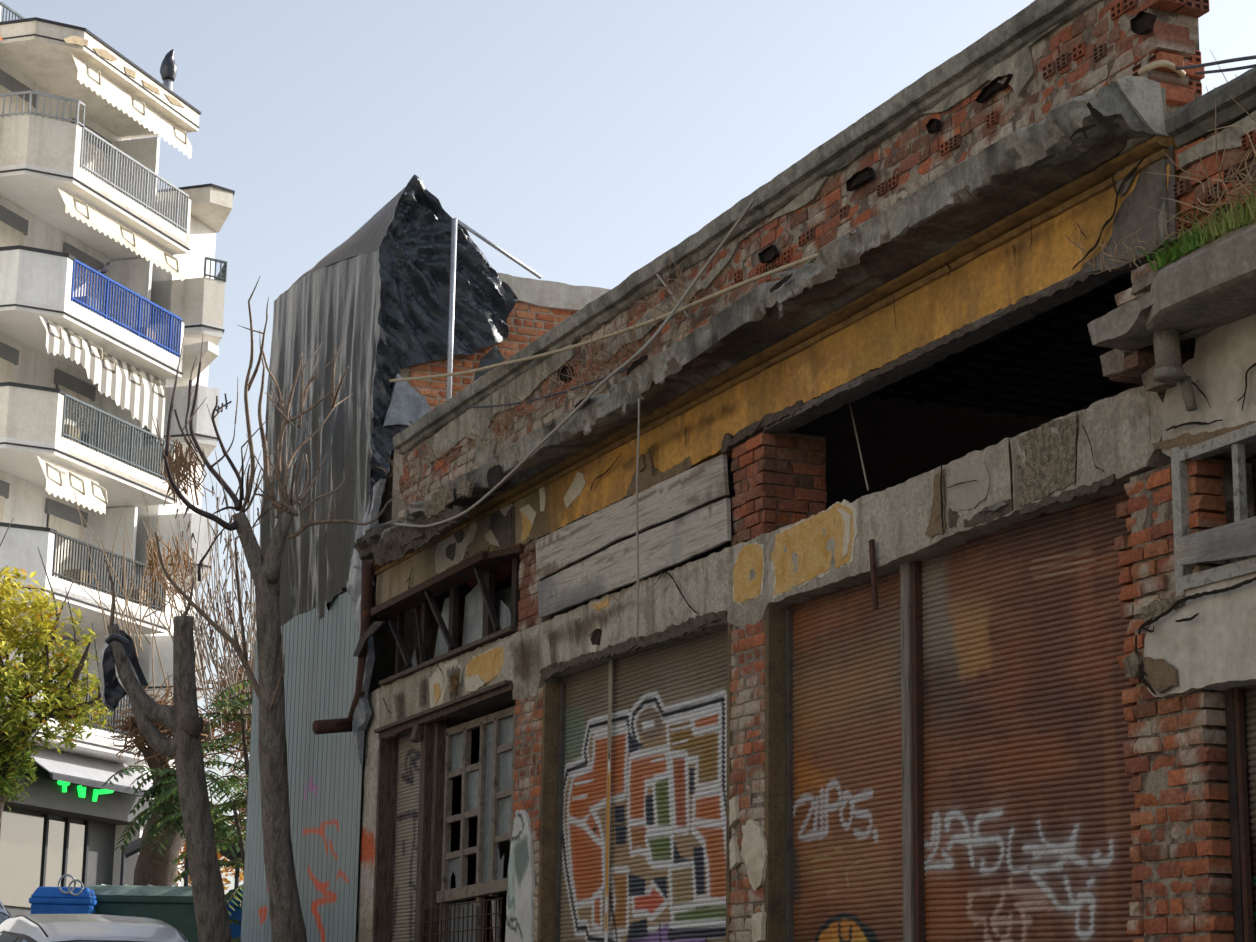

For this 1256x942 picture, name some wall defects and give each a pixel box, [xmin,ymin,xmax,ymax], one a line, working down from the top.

spalling [975,74,1013,104]
spalling [925,118,941,134]
crack [999,102,1120,251]
crack [1072,155,1146,270]
spalling [720,145,1177,454]
spalling [557,365,573,381]
crack [1165,363,1256,431]
peeling [539,499,858,680]
peeling [428,647,504,708]
spalling [1123,651,1178,693]
flaking render [729,796,768,891]
flaking render [751,912,766,942]